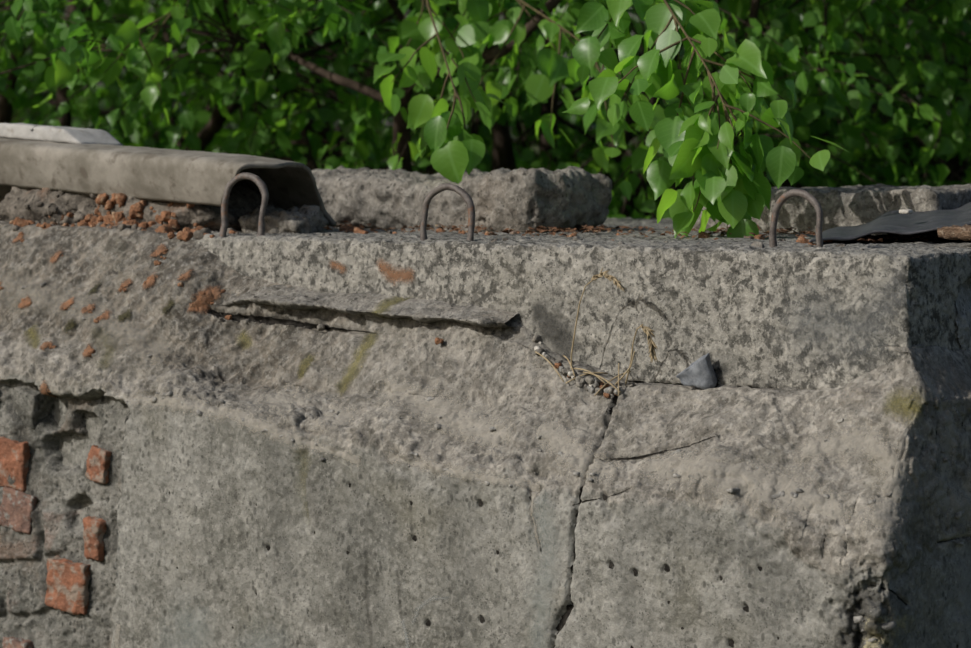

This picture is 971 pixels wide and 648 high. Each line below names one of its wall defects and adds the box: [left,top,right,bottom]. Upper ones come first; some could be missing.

flaking render [0,436,39,534]
flaking render [85,445,114,484]
crack [598,395,718,461]
flaking render [42,515,110,615]
crack [554,486,630,647]
flaking render [2,637,33,648]